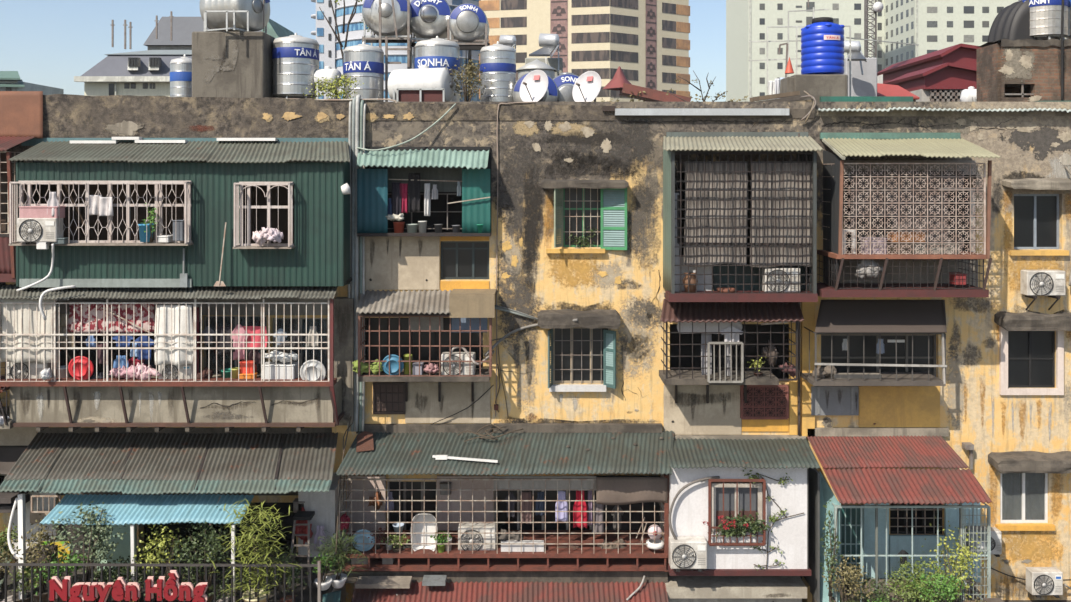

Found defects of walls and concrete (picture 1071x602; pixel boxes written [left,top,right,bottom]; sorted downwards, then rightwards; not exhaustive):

spalling [512,120,612,153]
spalling [998,122,1071,166]
damp [493,118,661,386]
damp [954,297,995,312]
damp [950,326,995,365]